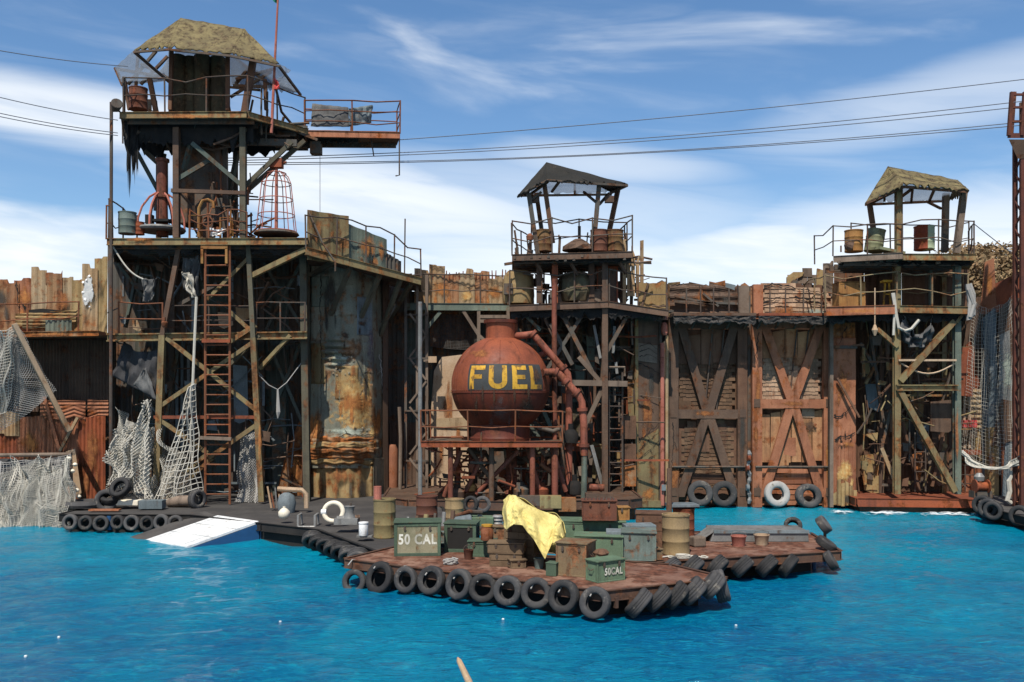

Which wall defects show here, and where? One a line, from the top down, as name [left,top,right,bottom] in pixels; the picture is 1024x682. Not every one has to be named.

rust [84,436,98,490]
rust [310,376,382,495]